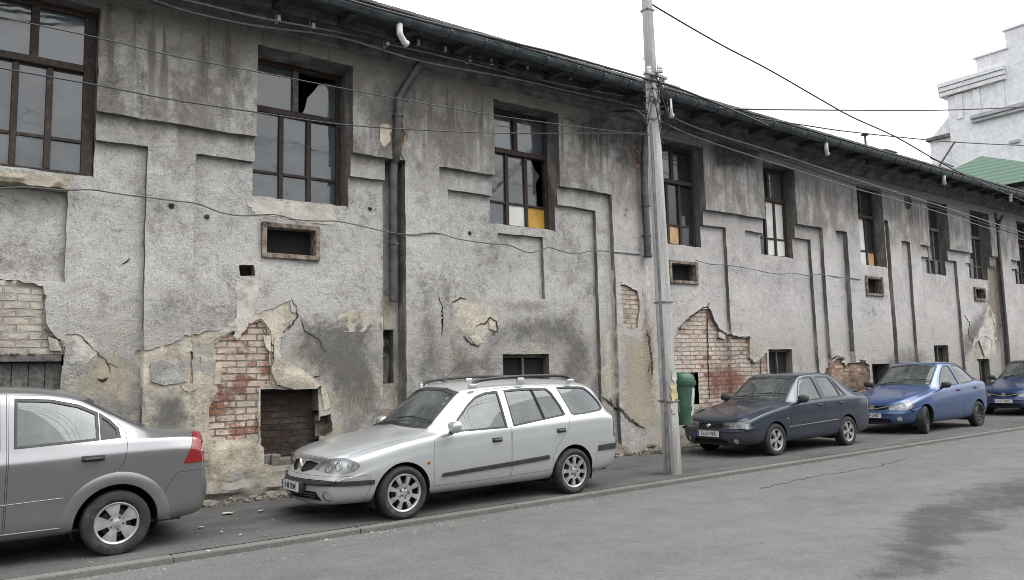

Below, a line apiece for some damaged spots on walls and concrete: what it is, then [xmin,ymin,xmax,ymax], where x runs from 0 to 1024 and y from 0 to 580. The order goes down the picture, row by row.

peeling [380,123,392,147]
spalling [0,250,316,446]
peeling [452,297,498,346]
spalling [603,269,657,431]
spalling [672,296,772,412]
spalling [813,344,874,393]
peeling [971,306,997,371]
crack [602,397,646,429]